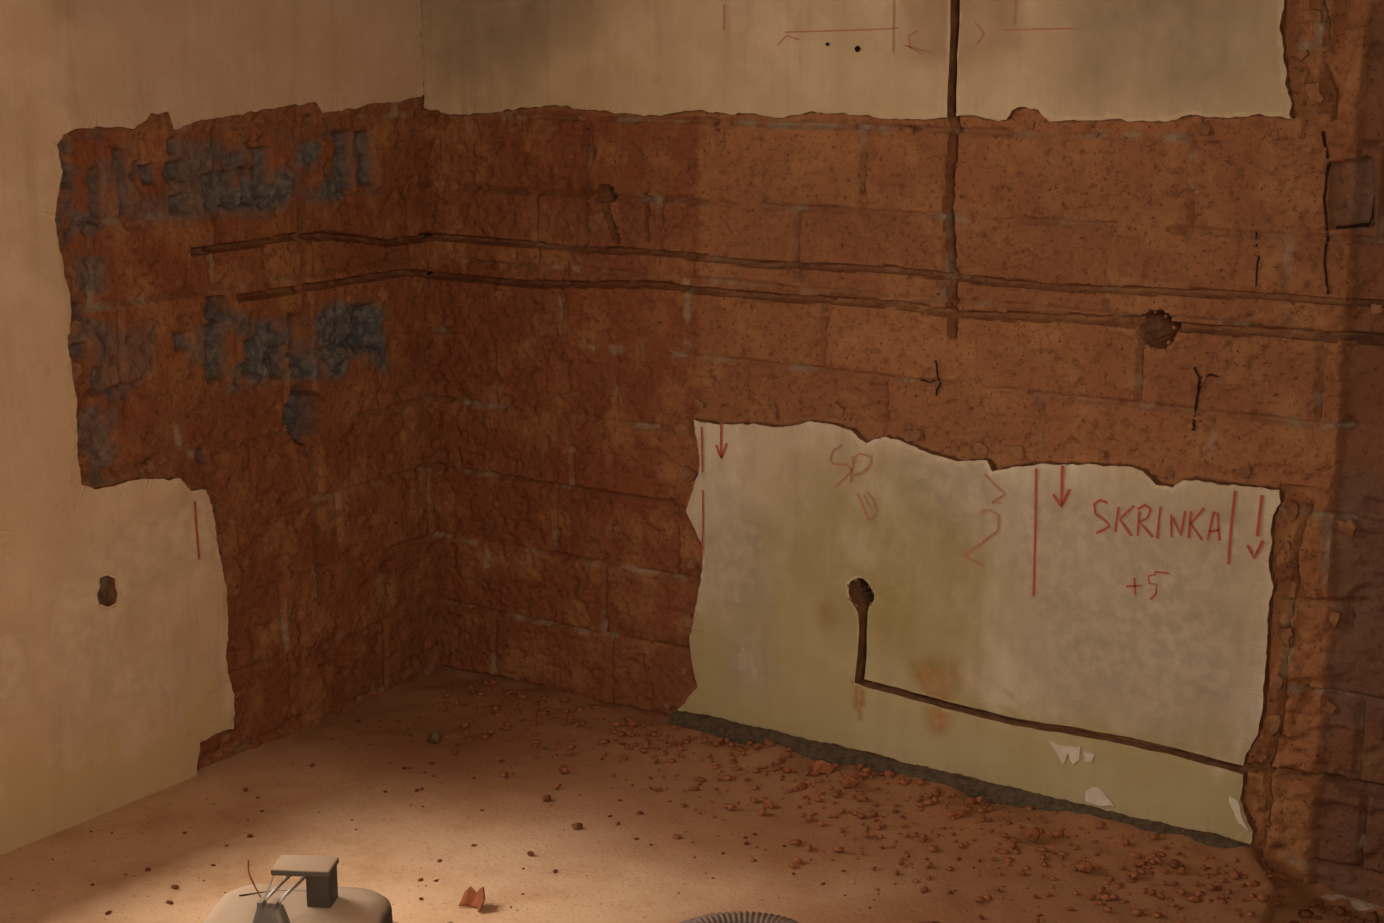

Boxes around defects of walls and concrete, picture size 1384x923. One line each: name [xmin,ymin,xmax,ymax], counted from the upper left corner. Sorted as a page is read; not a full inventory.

spalling [953,0,1384,300]
spalling [55,95,1384,785]
peeling [1078,786,1114,807]
peeling [1228,794,1249,830]